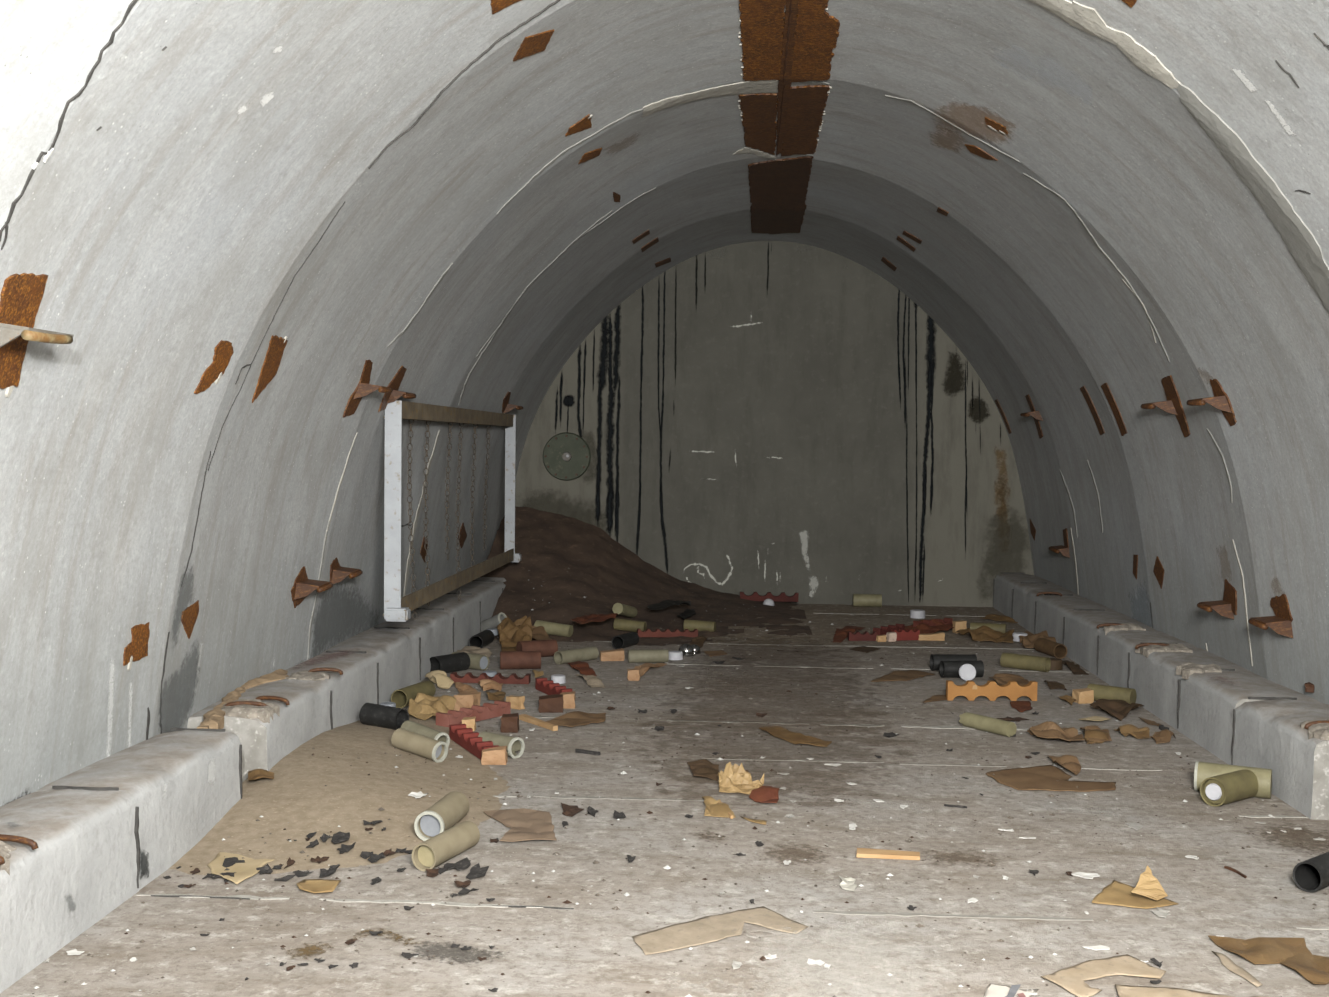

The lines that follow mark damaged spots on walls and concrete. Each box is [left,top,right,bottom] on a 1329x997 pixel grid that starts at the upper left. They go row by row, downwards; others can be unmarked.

water stain [555,305,621,542]
water stain [636,272,677,574]
water stain [695,255,706,305]
water stain [897,290,1001,602]